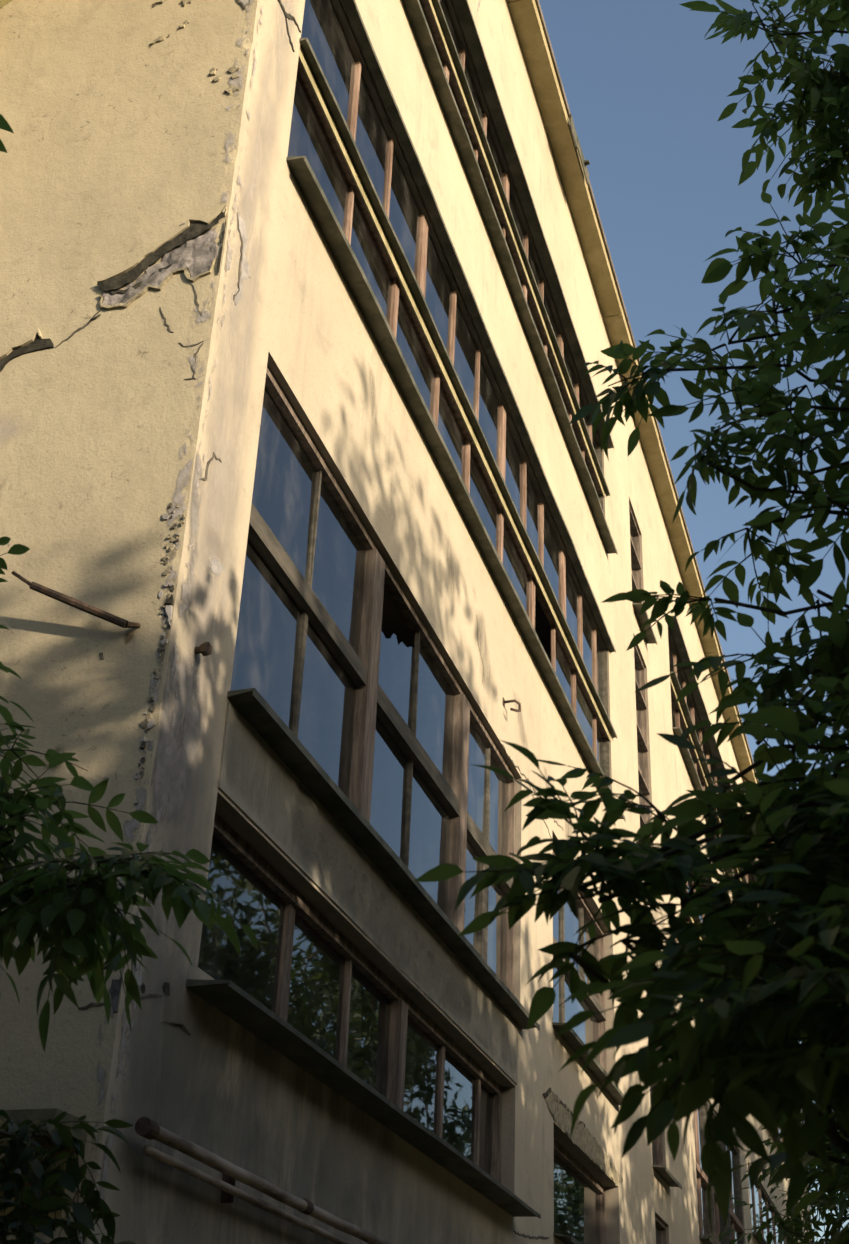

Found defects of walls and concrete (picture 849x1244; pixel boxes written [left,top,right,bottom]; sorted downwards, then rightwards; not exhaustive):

peeling [149,0,191,47]
crack [237,0,301,52]
flaking render [55,205,251,348]
crack [160,284,204,380]
flaking render [134,453,202,821]